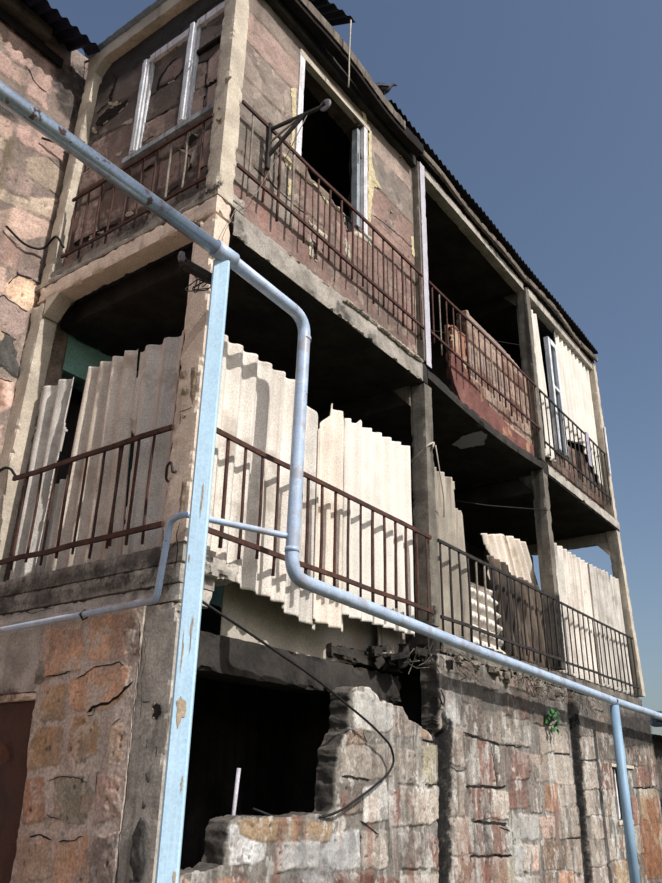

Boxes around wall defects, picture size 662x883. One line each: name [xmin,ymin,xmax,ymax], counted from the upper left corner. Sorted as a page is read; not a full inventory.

spalling [92,100,133,134]
peeling [452,431,487,449]
leakage [0,551,174,614]
crack [46,618,149,883]
peeling [151,696,186,757]
spalling [129,801,146,883]